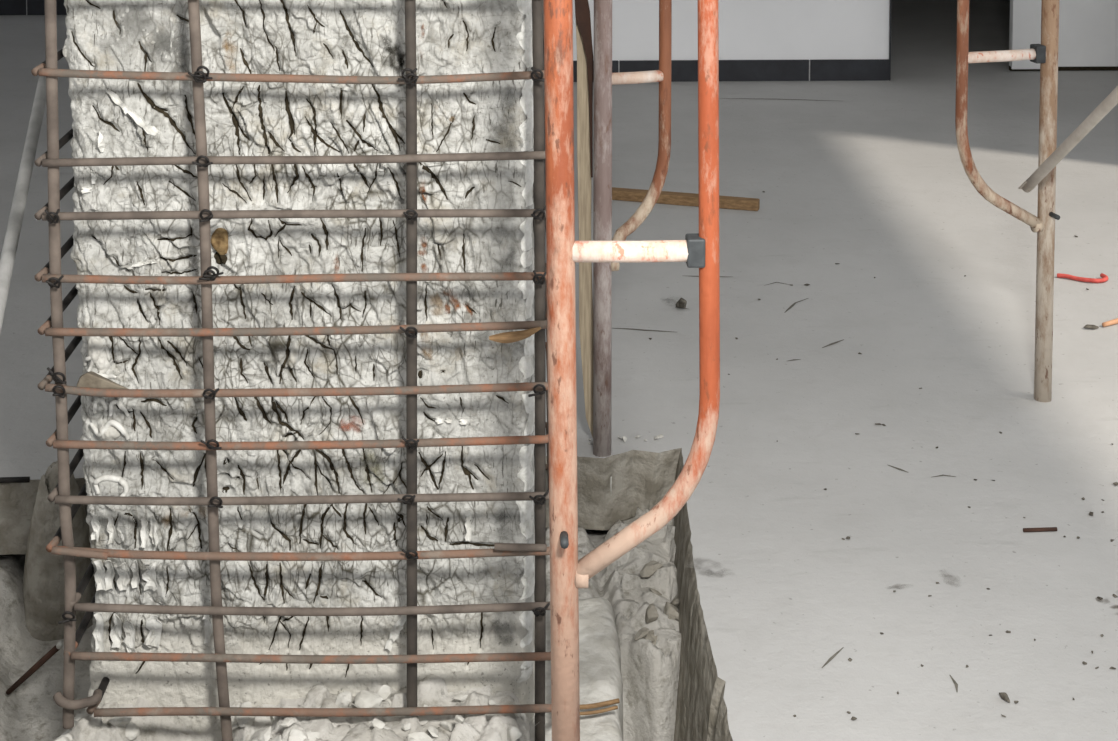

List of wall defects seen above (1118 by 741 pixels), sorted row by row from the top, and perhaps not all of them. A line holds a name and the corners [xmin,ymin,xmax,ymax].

crack [71,31,94,67]
flaking render [106,89,159,136]
spalling [516,0,534,319]
spalling [211,228,228,264]
corrosion [432,293,472,314]
crack [86,0,500,677]
flaking render [89,397,130,440]
spalling [516,335,535,540]
flaking render [93,475,129,496]
flaking render [91,515,159,591]
flaking render [93,612,162,652]
spalling [517,556,535,683]